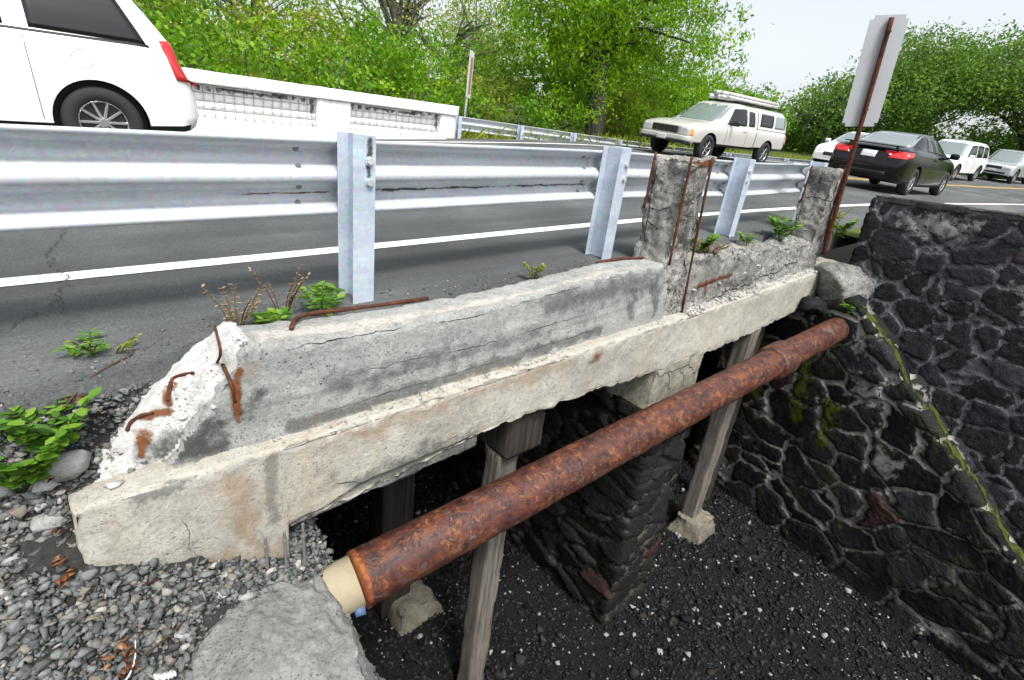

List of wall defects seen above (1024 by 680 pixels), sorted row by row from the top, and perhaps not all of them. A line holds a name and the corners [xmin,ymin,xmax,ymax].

spalling [643,152,658,208]
spalling [668,156,762,313]
spalling [823,168,846,242]
crack [287,288,576,350]
corrosion [136,382,177,458]
spalling [94,322,252,482]
corrosion [228,367,244,423]
crack [329,305,615,412]
crack [655,353,695,390]
leakage [848,372,889,408]
leakage [862,445,904,482]
spalling [128,477,190,514]